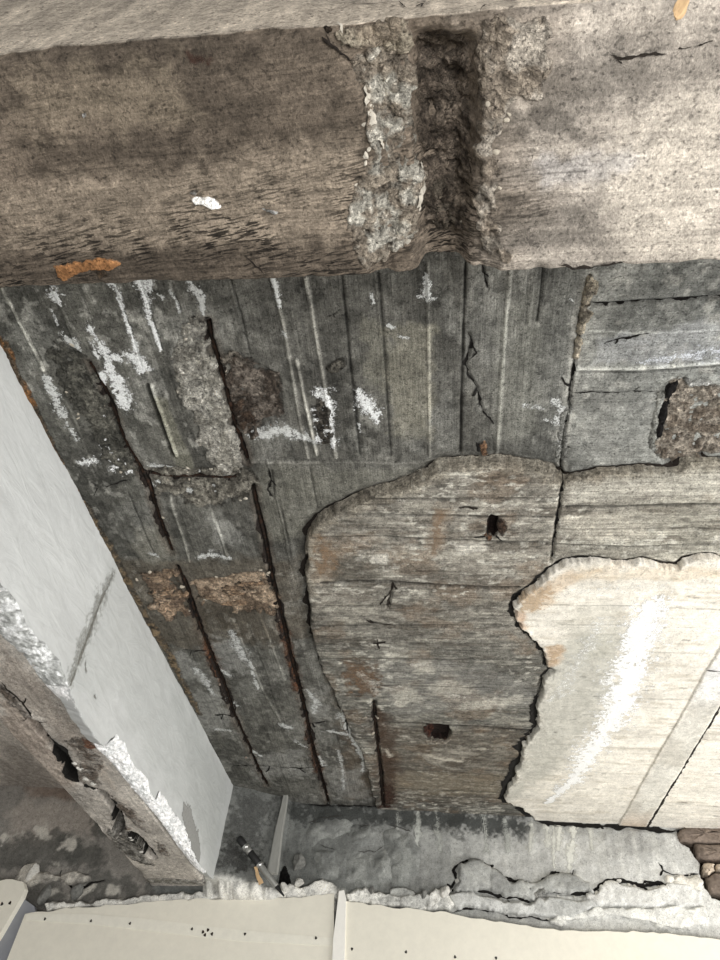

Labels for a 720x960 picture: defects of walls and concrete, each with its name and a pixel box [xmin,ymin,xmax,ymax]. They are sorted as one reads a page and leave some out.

spalling [324,12,554,270]
efflorescence [46,280,181,415]
efflorescence [42,373,80,441]
efflorescence [245,387,340,449]
efflorescence [353,388,382,433]
spalling [648,376,720,462]
crack [267,470,276,497]
spalling [45,316,329,801]
crack [299,261,720,834]
flaking render [0,583,206,885]
crack [232,763,341,773]
flaking render [449,827,720,931]